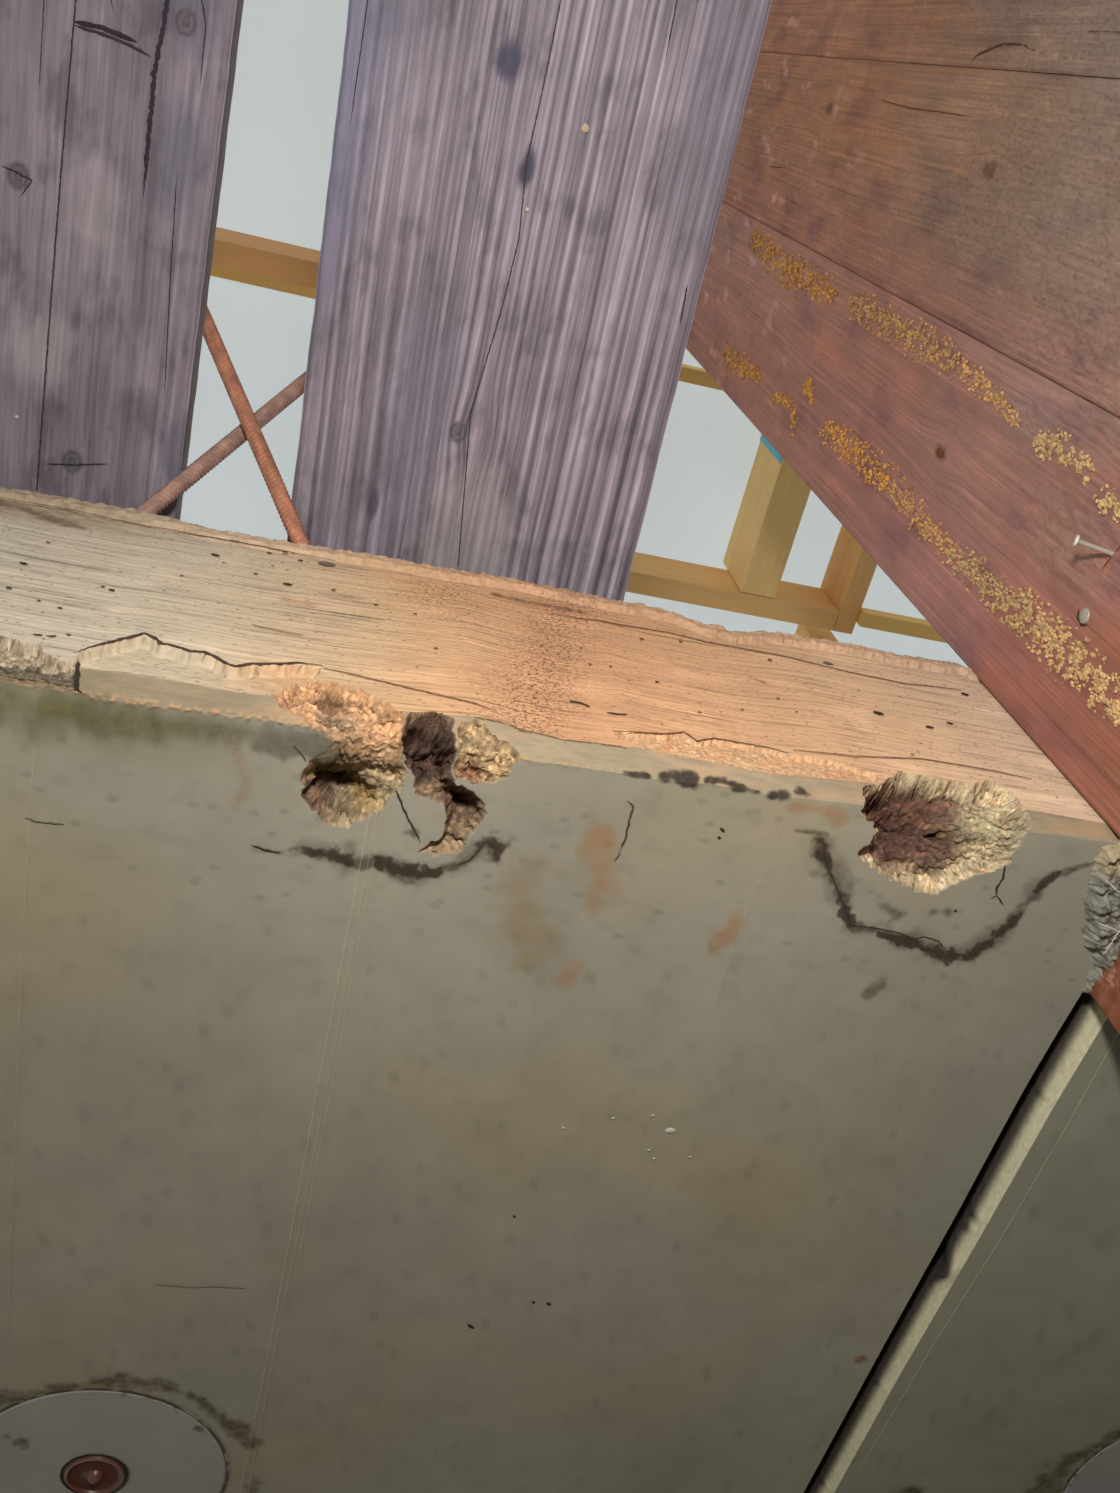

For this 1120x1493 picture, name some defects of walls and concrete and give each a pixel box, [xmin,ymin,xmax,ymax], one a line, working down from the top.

spalling [0,632,522,857]
water stain [303,847,354,866]
water stain [374,838,505,878]
water stain [803,831,1022,966]
water stain [1034,869,1074,893]